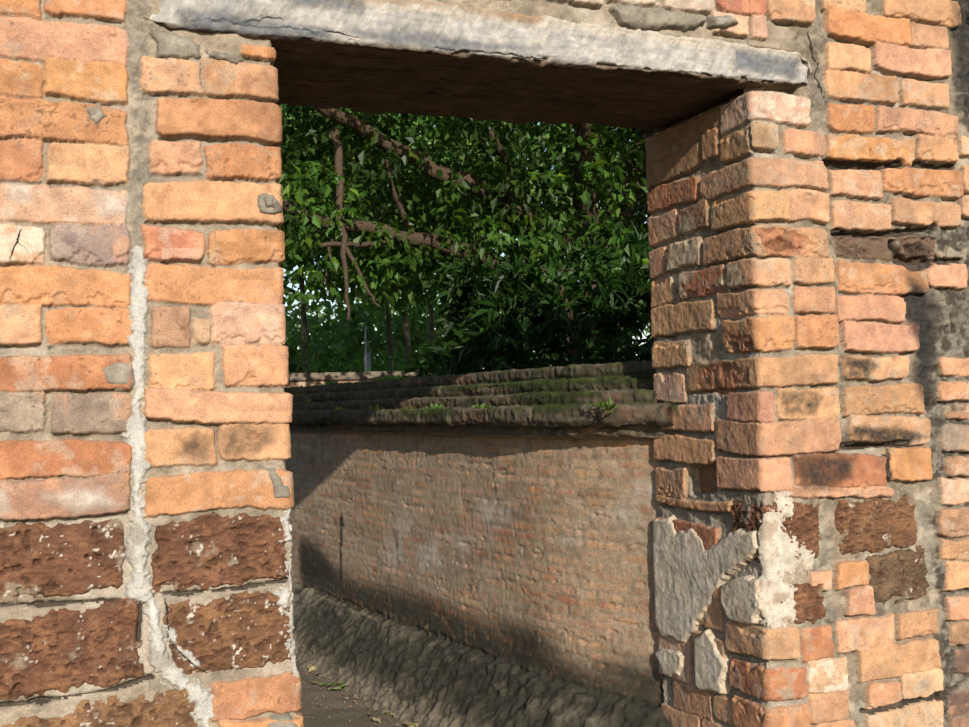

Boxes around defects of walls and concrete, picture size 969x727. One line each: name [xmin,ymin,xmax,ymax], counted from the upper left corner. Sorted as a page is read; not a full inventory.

crack [10,229,27,258]
leakage [265,508,671,727]
flaking render [653,490,815,695]